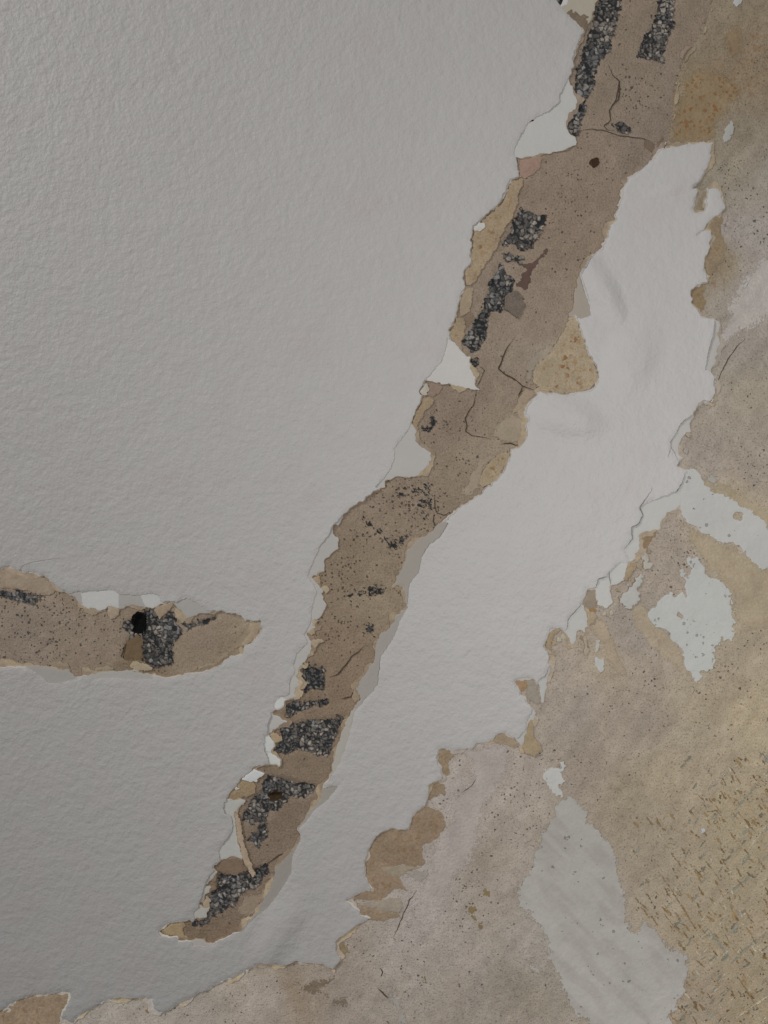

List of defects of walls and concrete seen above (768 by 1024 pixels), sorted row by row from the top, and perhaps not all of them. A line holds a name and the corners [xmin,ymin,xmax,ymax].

peeling [0,566,262,683]
peeling [64,506,768,1024]
peeling [158,0,712,947]
crack [465,337,533,446]
crack [580,67,645,140]
peeling [623,0,768,559]